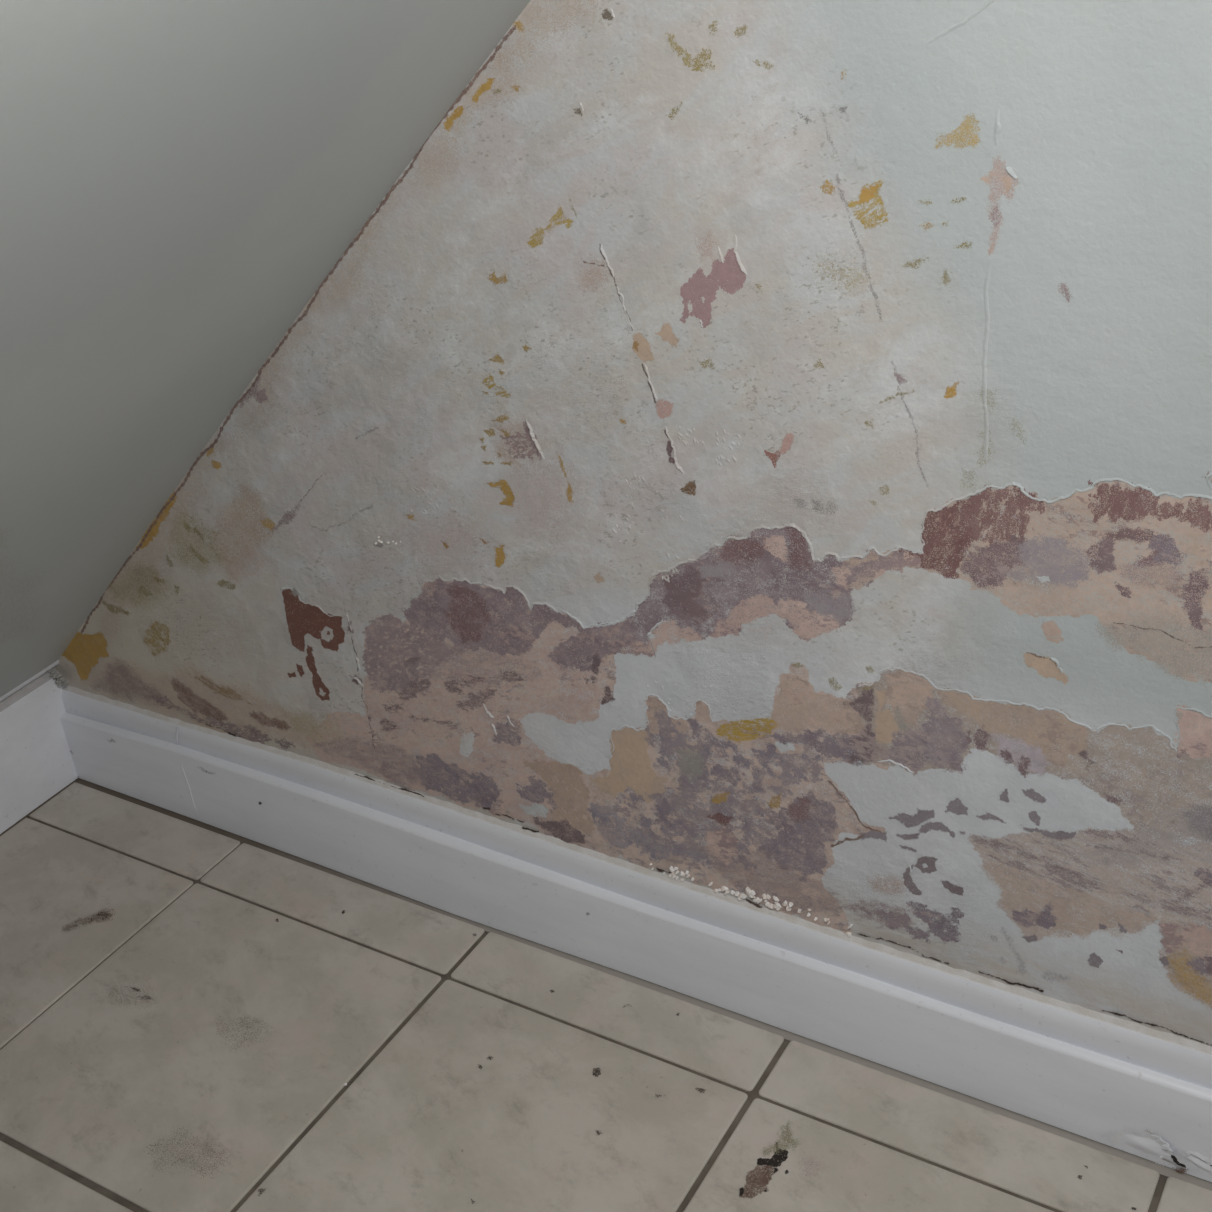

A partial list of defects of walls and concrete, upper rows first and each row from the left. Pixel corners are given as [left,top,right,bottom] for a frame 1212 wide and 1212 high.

peeling [980,155,1020,256]
peeling [679,226,747,328]
crack [572,244,696,496]
peeling [487,414,545,470]
spalling [764,433,794,468]
peeling [281,471,1212,1010]